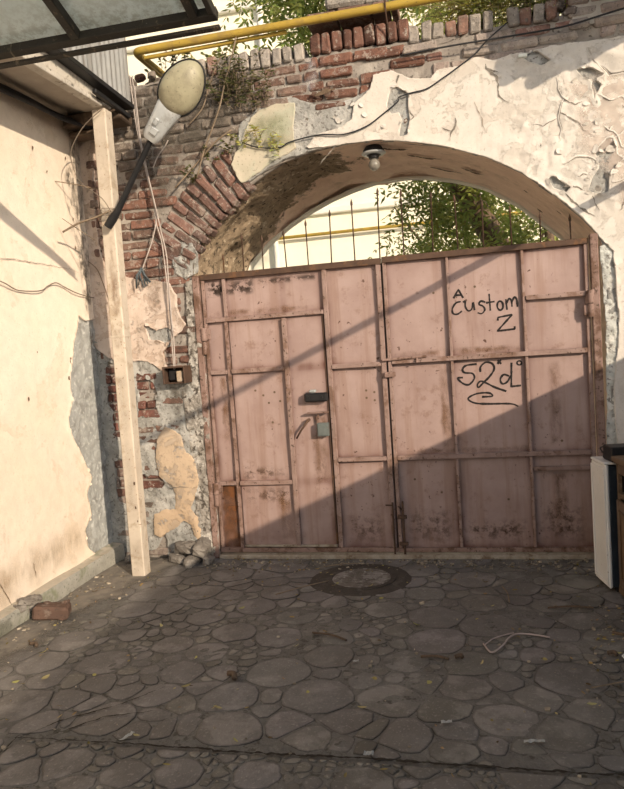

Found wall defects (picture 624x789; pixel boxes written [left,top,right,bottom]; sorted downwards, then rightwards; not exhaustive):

spalling [391,84,410,132]
crack [485,64,507,102]
crack [534,77,595,146]
crack [563,185,599,216]
spalling [143,323,177,347]
spalling [599,245,621,444]
spalling [172,242,221,556]
spalling [68,318,167,553]